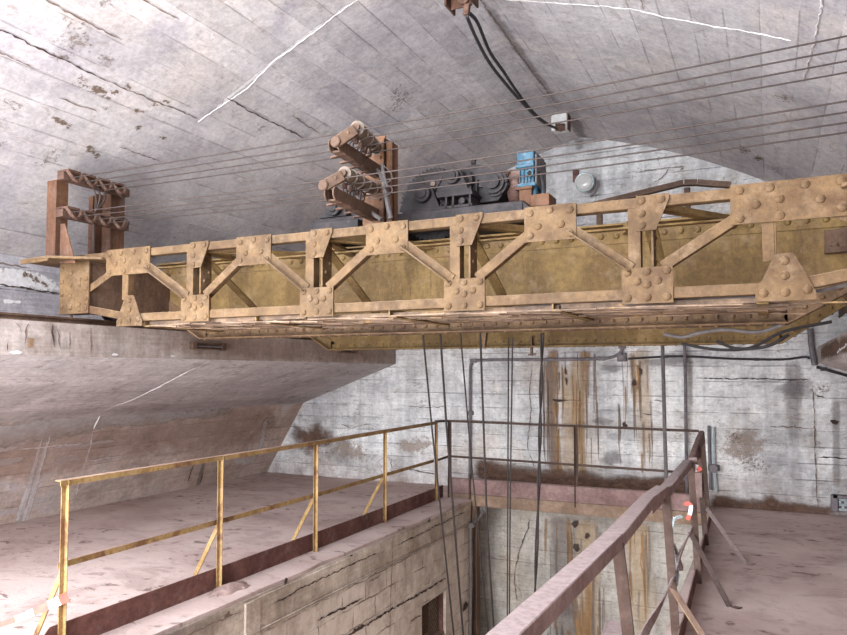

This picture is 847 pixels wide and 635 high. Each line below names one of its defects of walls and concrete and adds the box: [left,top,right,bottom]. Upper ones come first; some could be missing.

crack [0,0,357,138]
crack [480,0,554,101]
crack [509,0,791,41]
crack [801,0,824,83]
leakage [293,425,331,453]
rust [543,352,599,471]
crack [275,512,464,635]